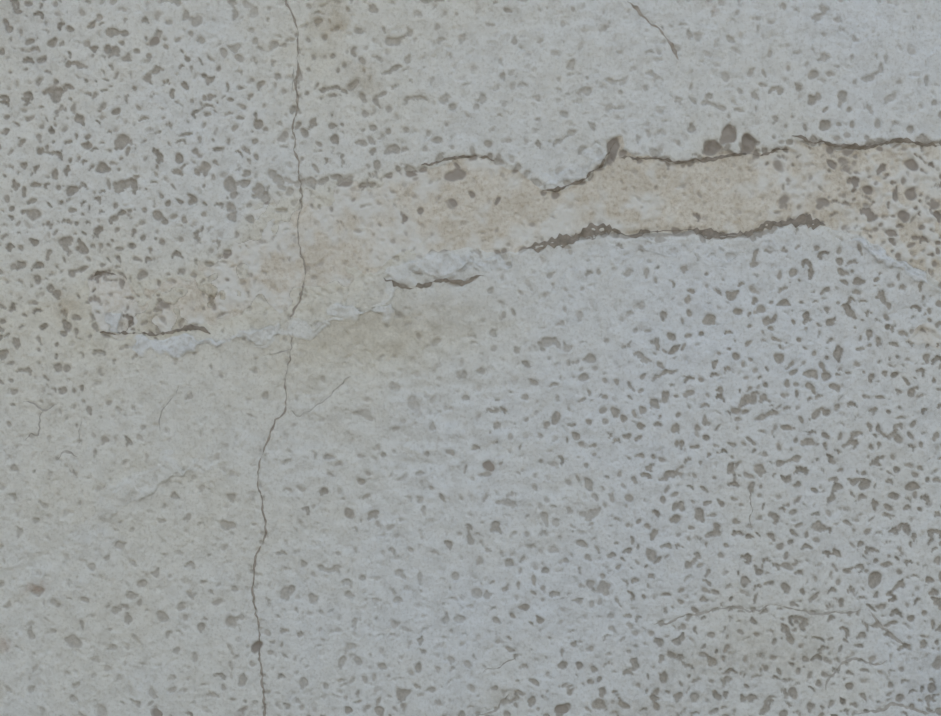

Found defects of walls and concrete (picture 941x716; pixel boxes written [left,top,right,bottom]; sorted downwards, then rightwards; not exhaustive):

crack [251,0,349,716]
spalling [87,135,941,359]